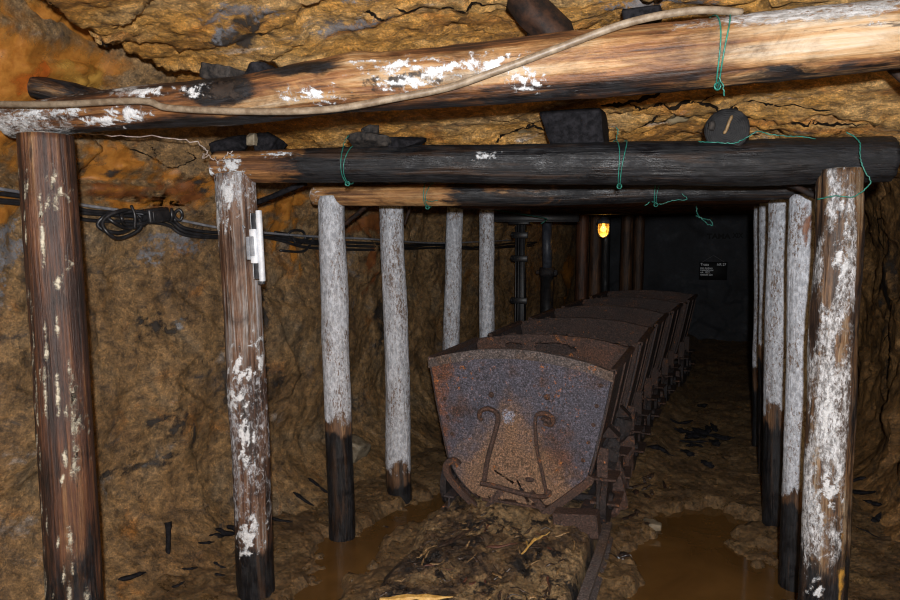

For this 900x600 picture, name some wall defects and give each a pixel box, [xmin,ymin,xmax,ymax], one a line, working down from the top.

water stain [350,50,546,91]
water stain [5,86,161,129]
water stain [831,251,850,296]
water stain [214,295,269,470]
water stain [821,367,837,454]
water stain [804,469,844,525]
water stain [236,510,269,559]